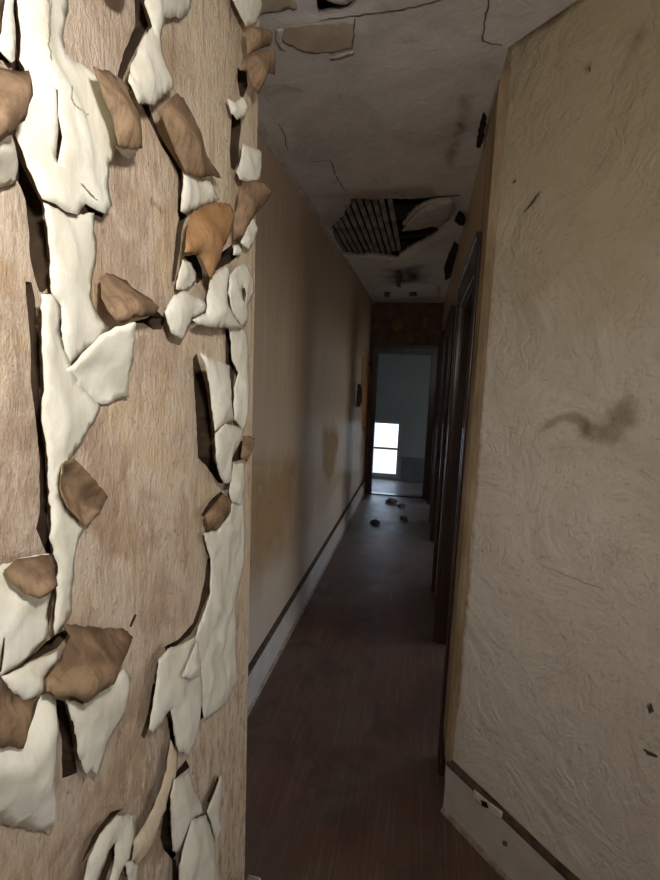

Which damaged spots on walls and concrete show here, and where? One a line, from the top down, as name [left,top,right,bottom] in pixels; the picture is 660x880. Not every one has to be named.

flaking render [260,0,297,15]
flaking render [259,19,354,61]
crack [325,0,441,51]
crack [481,0,503,46]